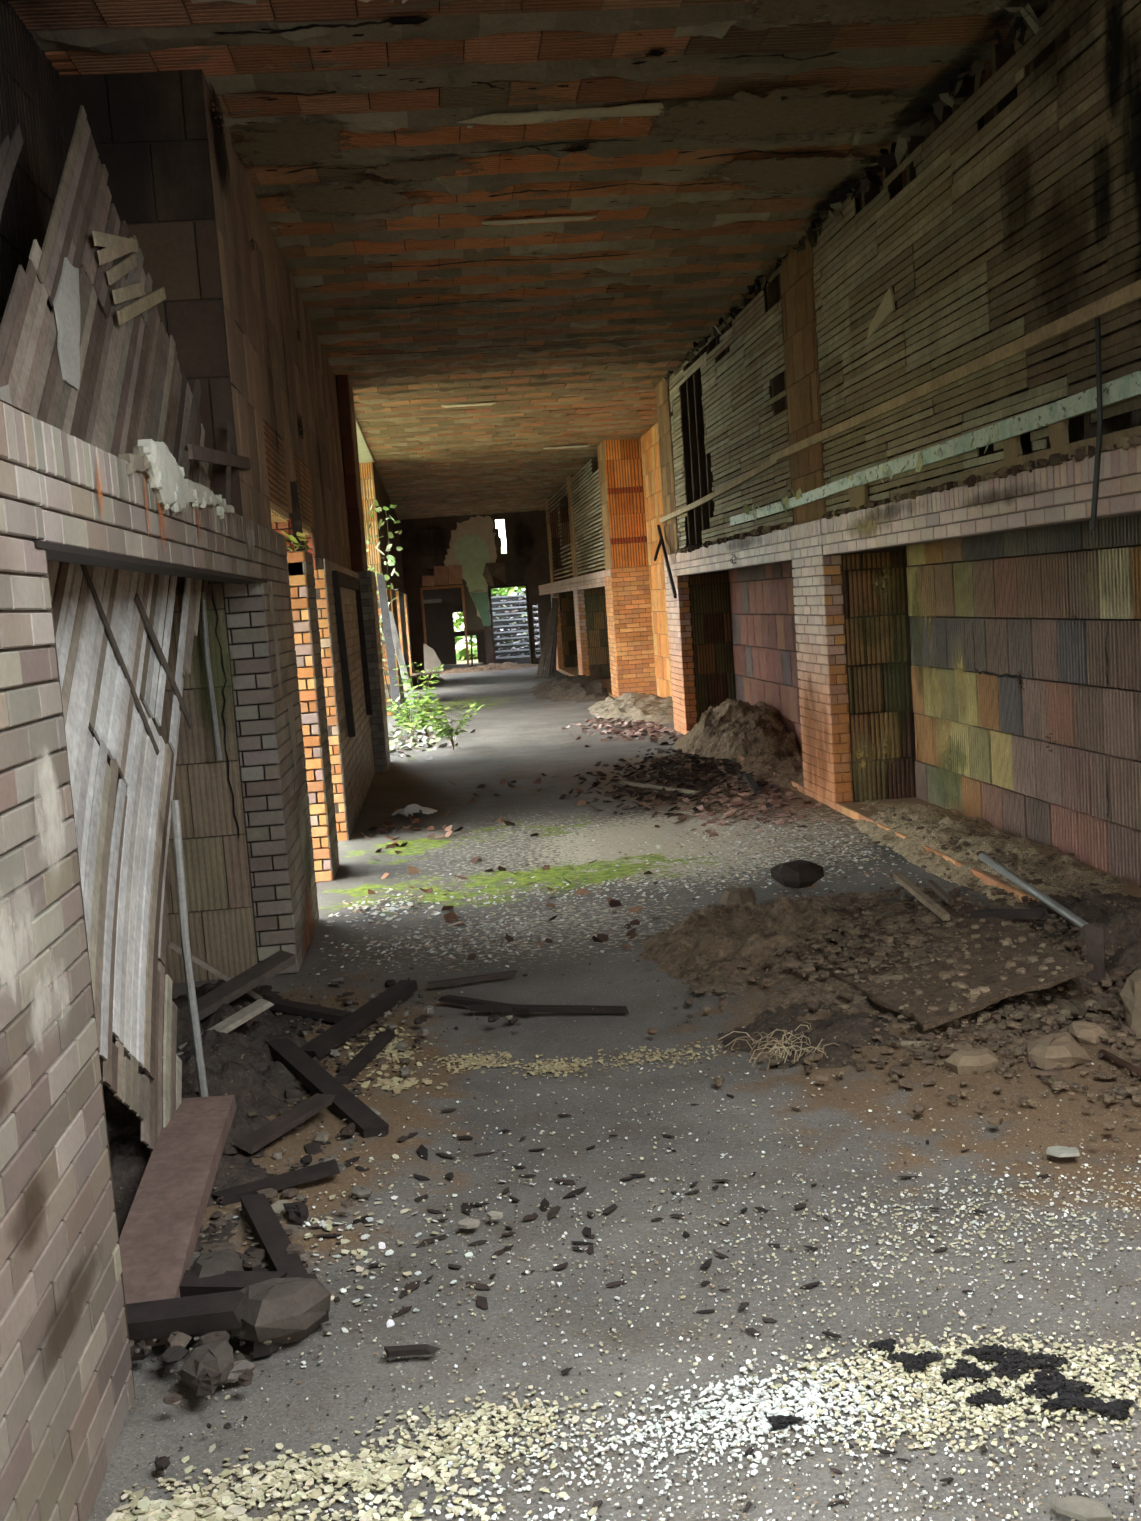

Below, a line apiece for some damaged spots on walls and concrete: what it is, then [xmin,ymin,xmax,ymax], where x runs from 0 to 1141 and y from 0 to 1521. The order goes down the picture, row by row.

peeling [631,20,737,65]
water stain [1038,0,1141,317]
spalling [118,439,235,519]
peeling [444,515,497,626]